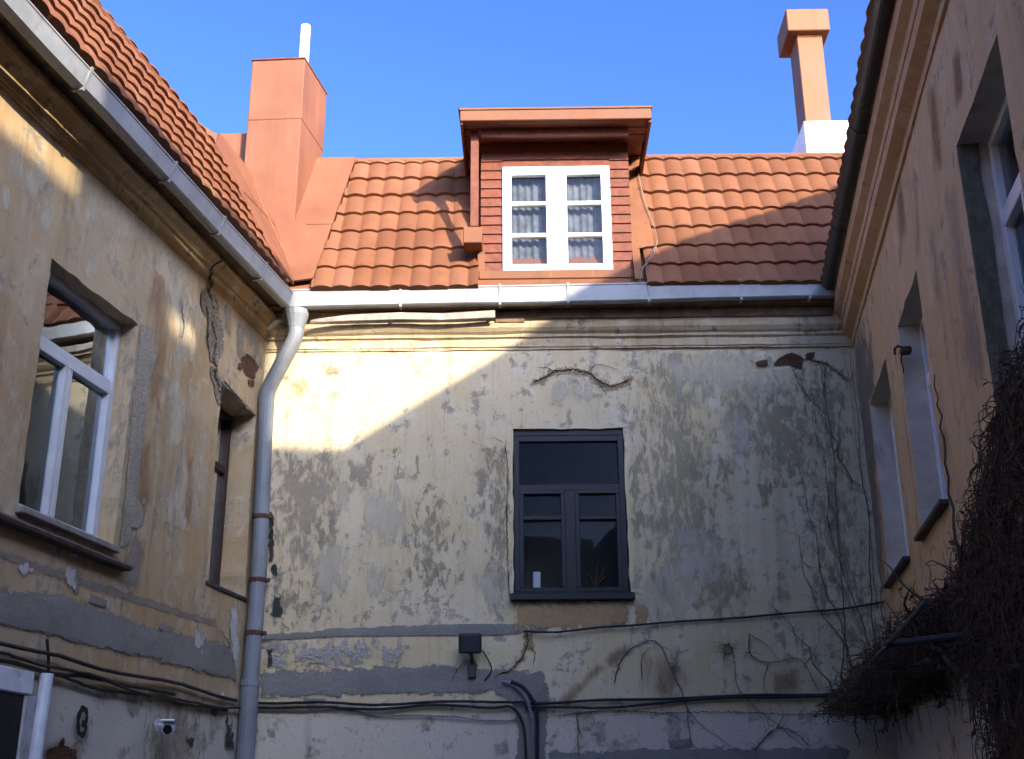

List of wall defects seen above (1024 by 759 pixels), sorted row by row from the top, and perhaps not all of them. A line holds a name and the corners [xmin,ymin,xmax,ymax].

spalling [120,324,158,548]
crack [180,256,254,414]
spalling [238,354,260,387]
peeling [263,452,410,673]
peeling [399,484,465,613]
peeling [475,441,511,609]
crack [530,363,636,394]
peeling [628,352,877,645]
crack [496,626,536,677]